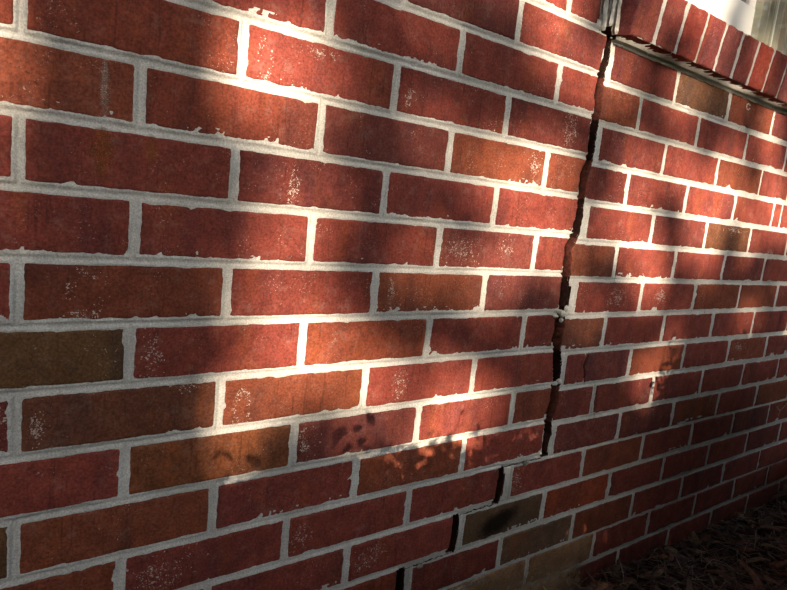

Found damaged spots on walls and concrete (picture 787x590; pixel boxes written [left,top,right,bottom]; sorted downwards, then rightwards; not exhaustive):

crack [395,30,616,590]